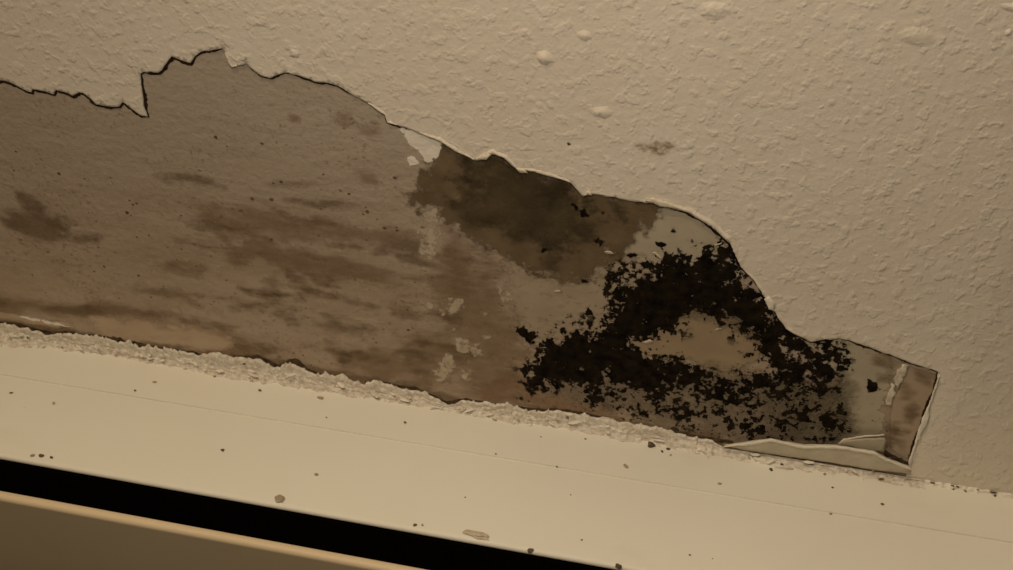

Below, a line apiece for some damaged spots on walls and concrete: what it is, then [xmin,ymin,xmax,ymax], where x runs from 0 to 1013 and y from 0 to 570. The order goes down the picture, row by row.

peeling [0,48,940,480]
leakage [406,143,856,444]
leakage [866,379,880,405]